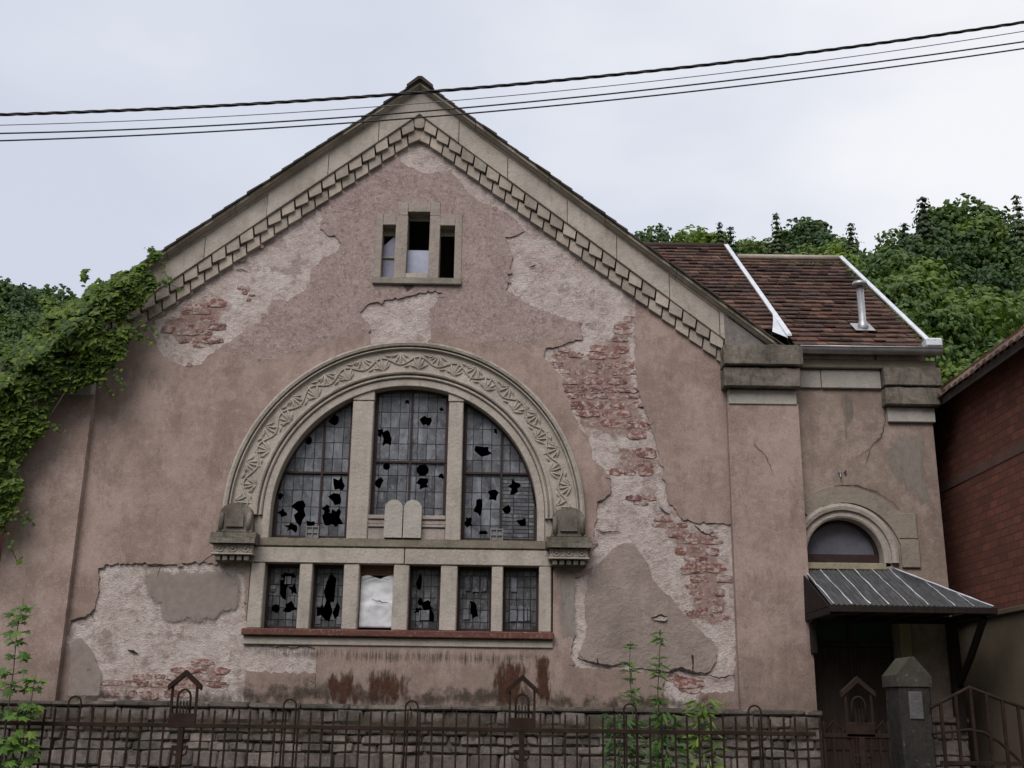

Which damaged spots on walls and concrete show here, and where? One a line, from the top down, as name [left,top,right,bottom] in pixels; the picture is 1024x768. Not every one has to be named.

peeling [153,206,341,367]
peeling [361,286,445,345]
peeling [398,142,736,709]
crack [834,408,901,511]
peeling [67,561,316,702]
damp [175,656,589,707]